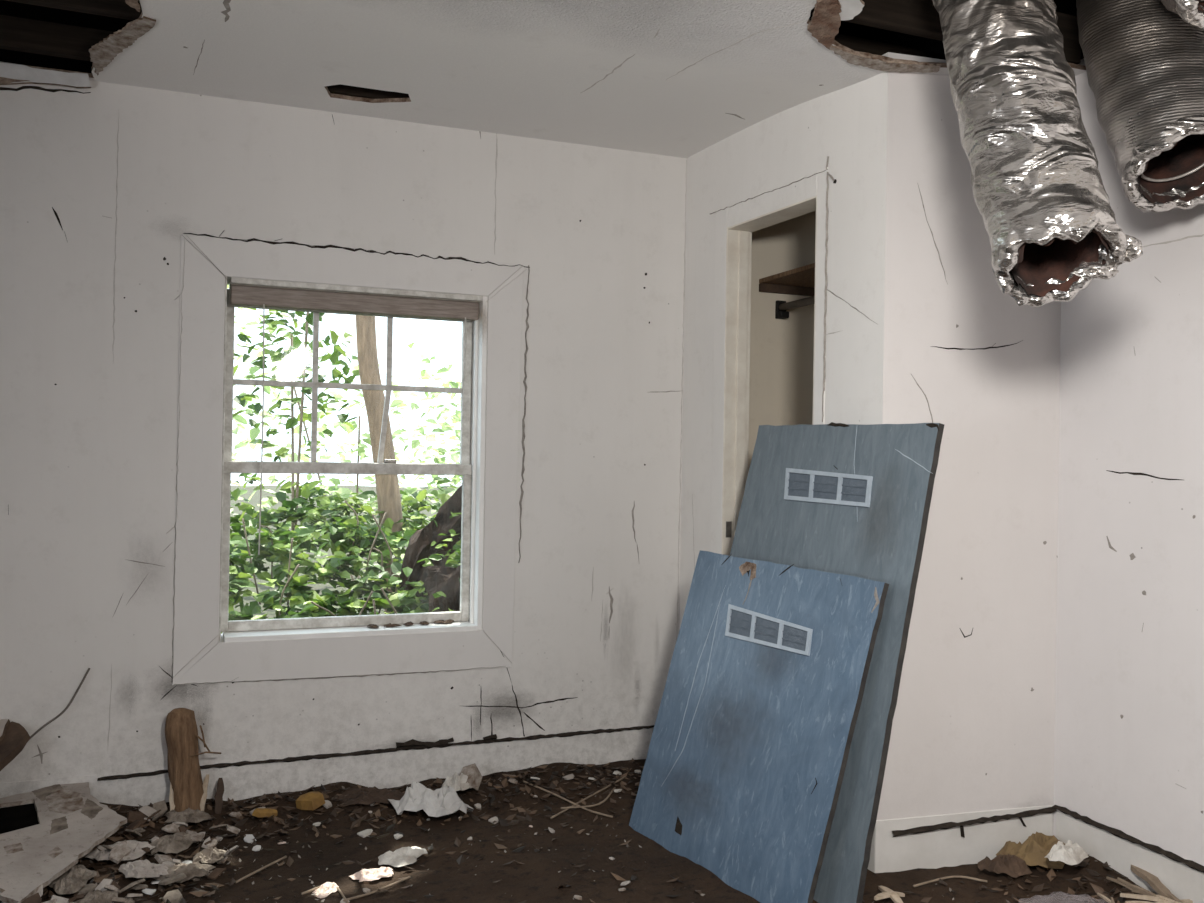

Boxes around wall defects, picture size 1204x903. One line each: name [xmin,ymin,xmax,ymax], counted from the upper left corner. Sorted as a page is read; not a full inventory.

spalling [0,0,156,94]
crack [193,0,231,75]
spalling [807,0,942,73]
crack [159,131,654,769]
crack [97,770,168,781]